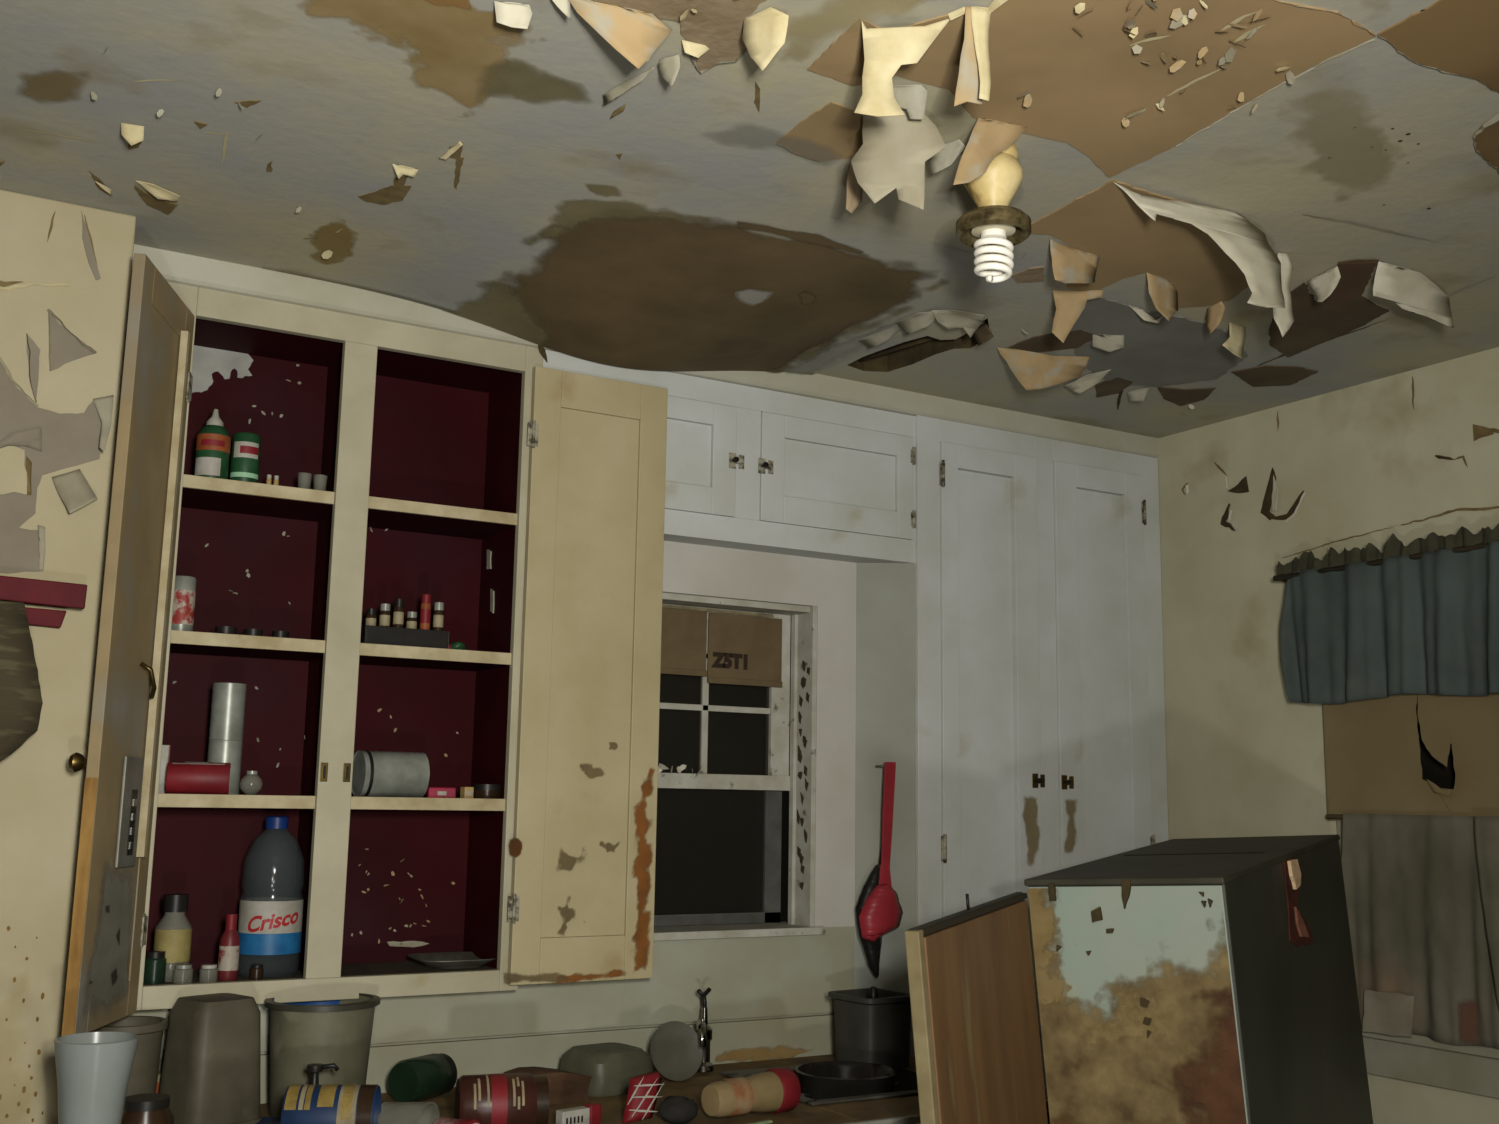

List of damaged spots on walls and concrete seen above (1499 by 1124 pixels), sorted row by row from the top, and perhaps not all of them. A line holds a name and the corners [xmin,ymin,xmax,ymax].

water stain [22,71,81,101]
peeling [20,109,164,150]
water stain [306,0,585,107]
peeling [494,1,532,29]
peeling [552,0,789,119]
peeling [358,164,419,205]
peeling [776,0,1499,415]
water stain [451,185,946,373]
crack [1409,377,1417,409]
peeling [0,309,114,574]
crack [1435,424,1499,468]
crack [1181,462,1499,558]